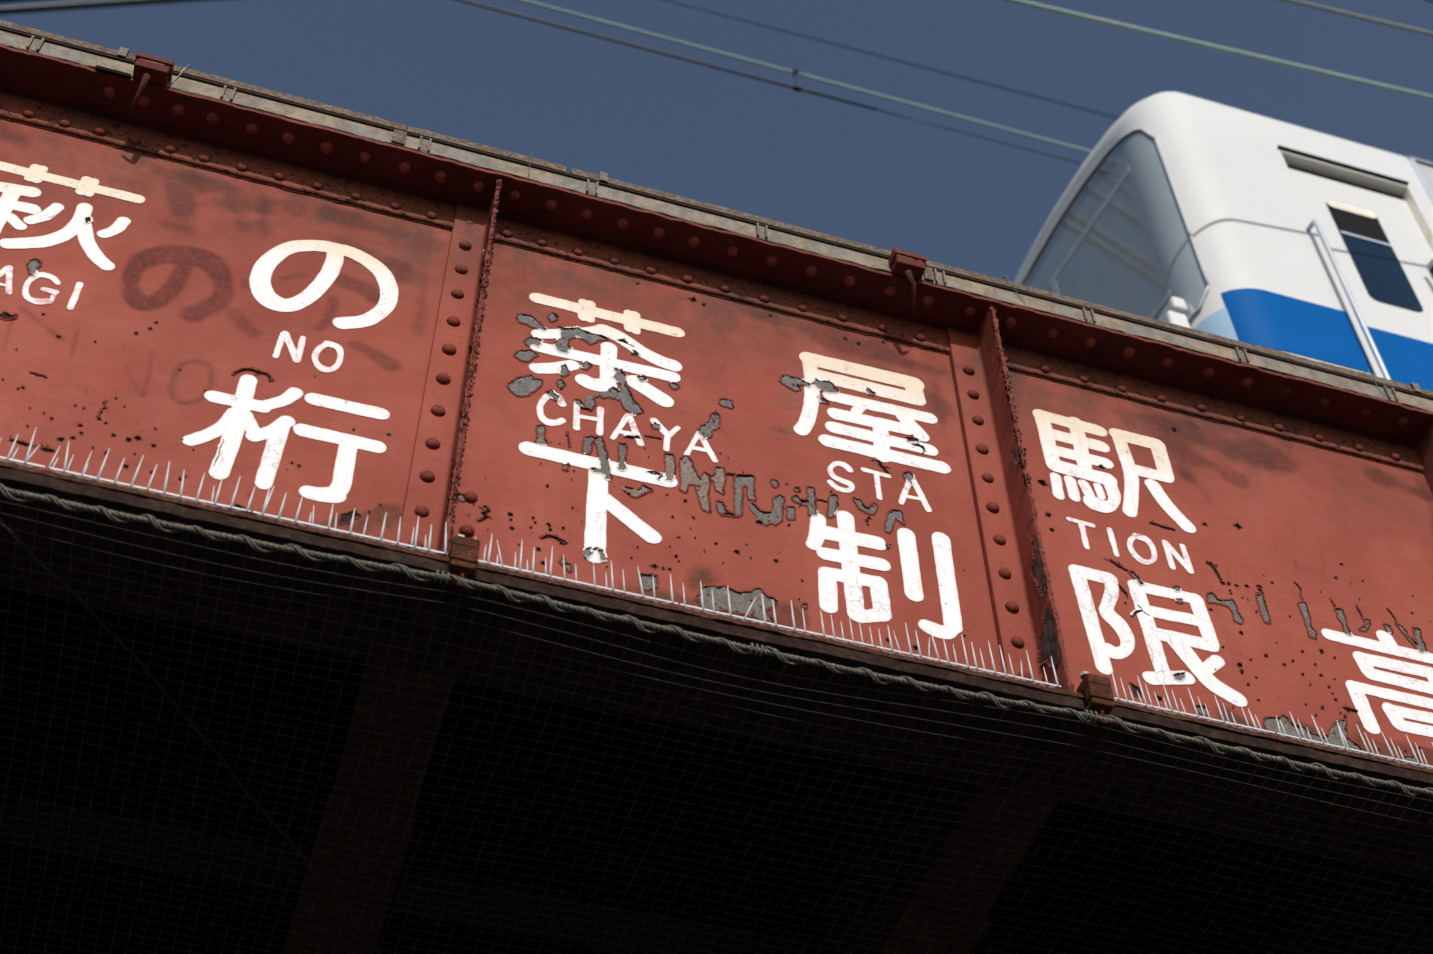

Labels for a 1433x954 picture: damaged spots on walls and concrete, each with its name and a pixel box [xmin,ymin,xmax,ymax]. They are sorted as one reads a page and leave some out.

peeling [507,312,662,430]
peeling [534,424,560,464]
peeling [697,397,735,440]
peeling [562,434,906,591]
peeling [695,584,778,623]
peeling [1029,535,1060,669]
peeling [1206,561,1273,634]
peeling [1334,595,1431,654]
peeling [1238,600,1381,753]